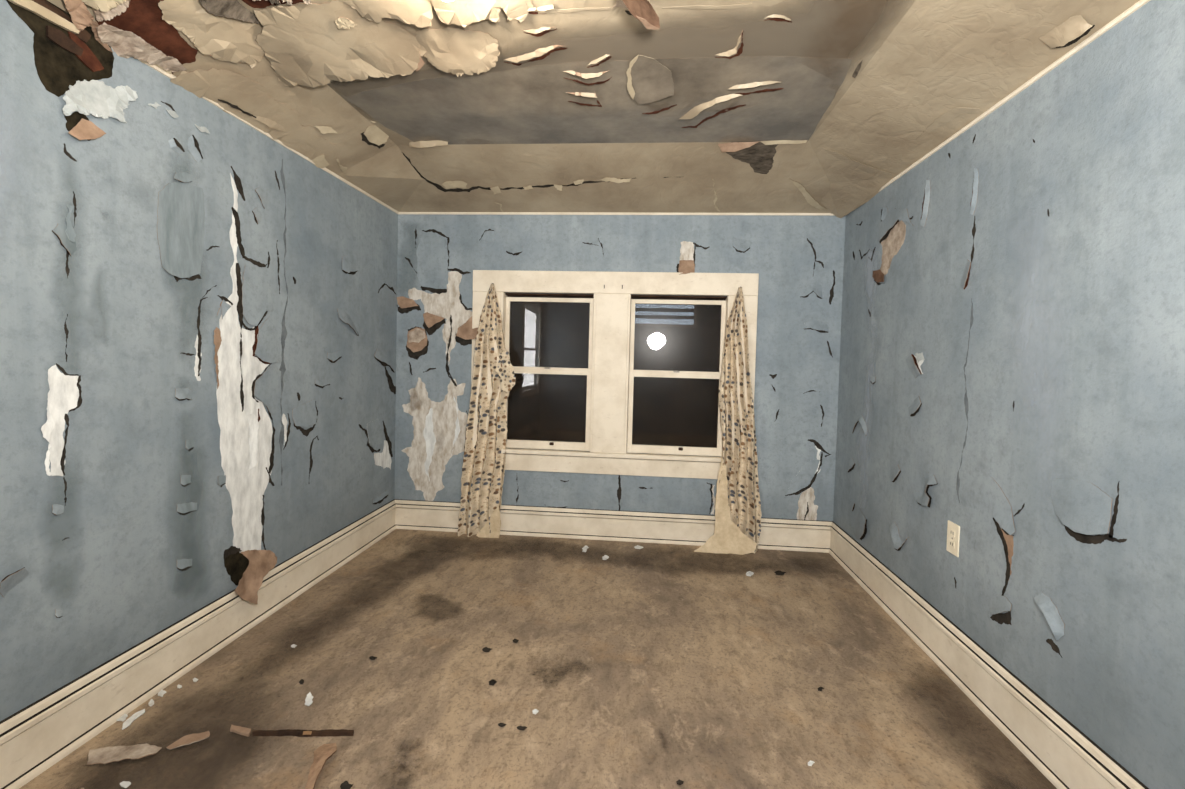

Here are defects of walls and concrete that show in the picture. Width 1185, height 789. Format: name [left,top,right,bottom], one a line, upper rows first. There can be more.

peeling [6,0,179,141]
peeling [361,121,389,149]
crack [402,152,635,194]
peeling [504,4,611,66]
peeling [563,54,612,107]
peeling [715,30,744,59]
peeling [680,81,784,128]
peeling [872,179,931,285]
flaking render [206,166,330,605]
flaking render [359,229,478,501]
flaking render [41,363,82,515]
peeling [989,477,1025,625]